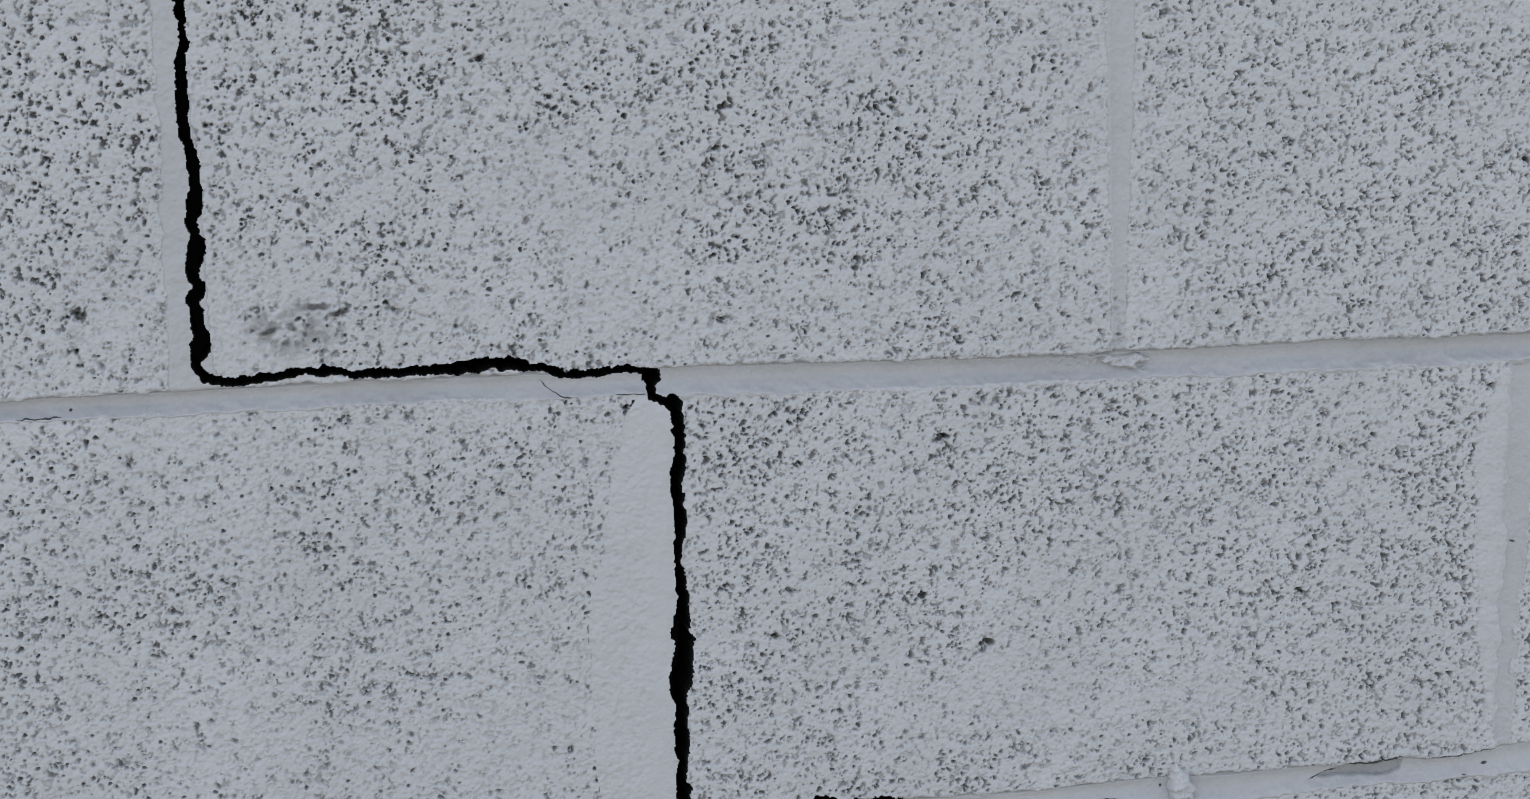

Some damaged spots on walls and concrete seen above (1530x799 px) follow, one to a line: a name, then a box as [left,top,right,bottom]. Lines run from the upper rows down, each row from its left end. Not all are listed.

crack [171,0,696,799]
crack [814,791,903,799]